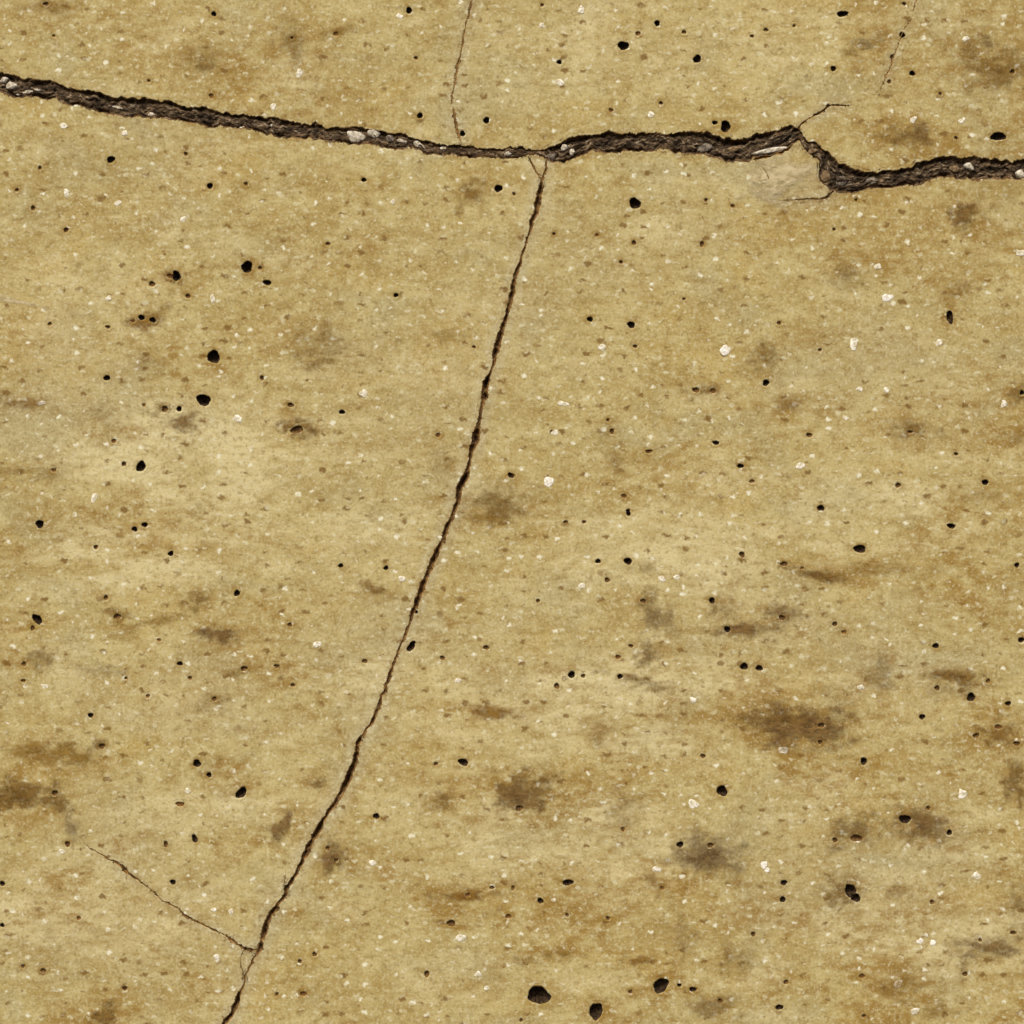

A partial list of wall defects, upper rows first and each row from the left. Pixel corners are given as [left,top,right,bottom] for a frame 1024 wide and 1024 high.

crack [0,0,1024,204]
crack [77,155,550,1024]